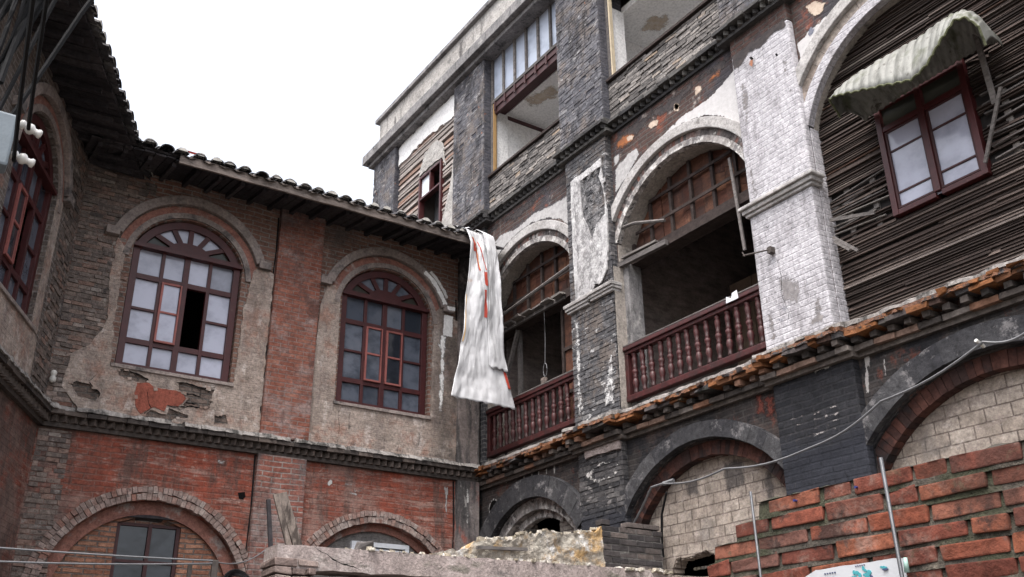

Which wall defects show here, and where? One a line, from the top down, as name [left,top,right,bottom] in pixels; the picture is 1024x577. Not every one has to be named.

damp [642,15,668,31]
damp [526,86,559,105]
peeling [648,72,749,133]
flaking render [495,135,639,300]
flaking render [31,141,157,403]
peeling [811,298,823,324]
peeling [117,368,227,424]
peeling [575,323,583,412]
peeling [605,355,614,405]